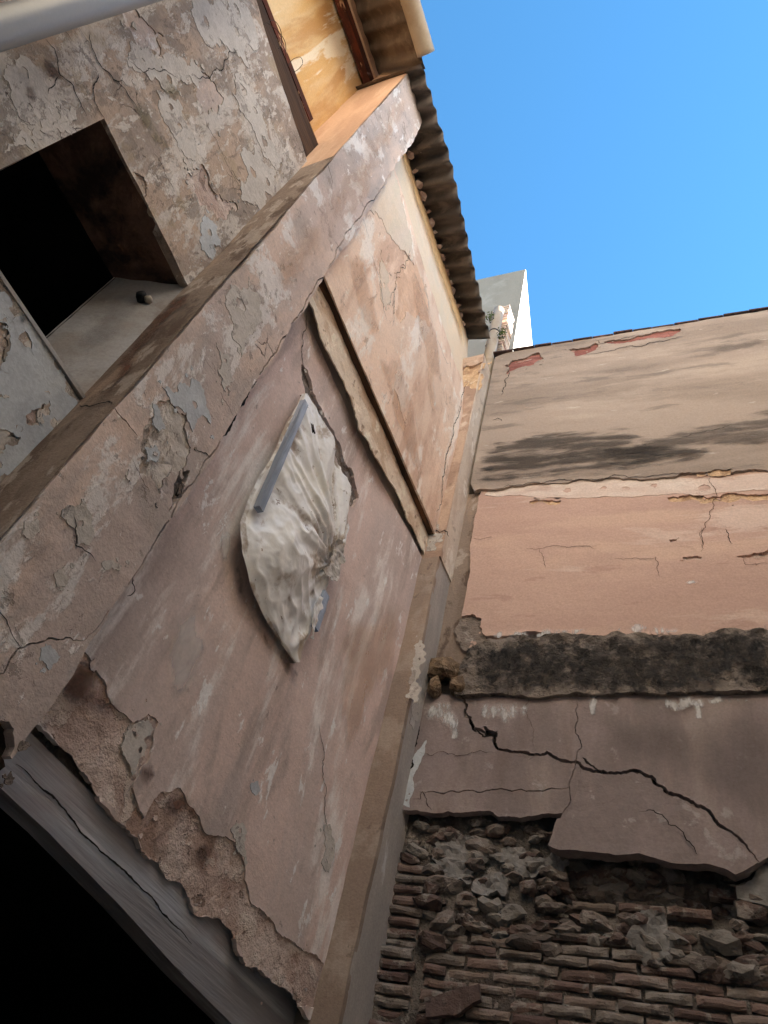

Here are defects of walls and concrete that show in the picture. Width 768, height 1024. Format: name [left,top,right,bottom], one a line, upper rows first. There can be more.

peeling [3,49,90,153]
peeling [120,0,283,261]
peeling [0,292,78,476]
spalling [125,365,214,508]
damp [481,433,705,480]
crack [498,472,768,565]
crack [0,612,66,649]
damp [479,625,768,718]
crack [410,709,499,769]
crack [524,699,604,800]
spalling [40,653,324,1007]
crack [636,773,720,854]